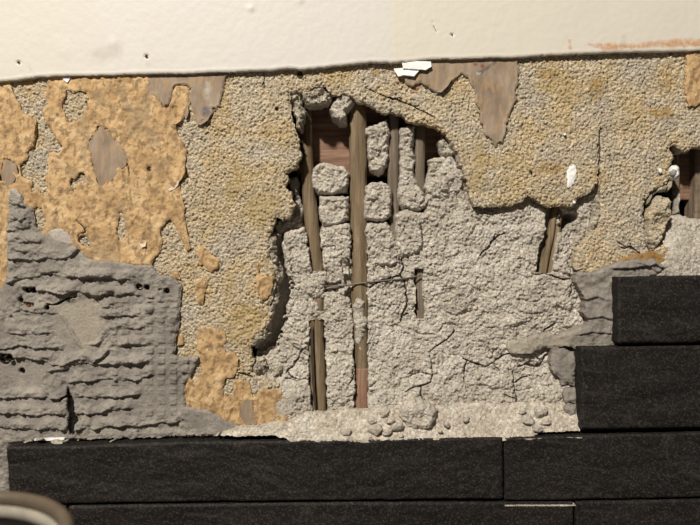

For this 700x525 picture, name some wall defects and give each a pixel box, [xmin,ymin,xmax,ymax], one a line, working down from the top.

spalling [290,87,332,134]
crack [366,88,435,118]
peeling [394,58,520,147]
peeling [0,73,229,288]
spalling [643,182,668,206]
spalling [250,234,284,347]
crack [370,258,408,322]
crack [406,331,455,398]
crack [463,353,548,402]